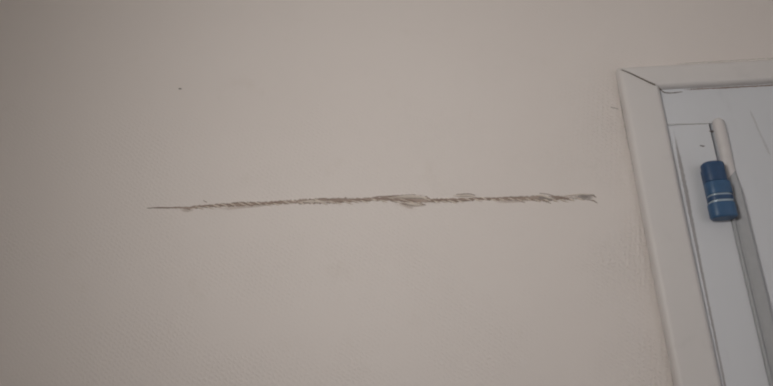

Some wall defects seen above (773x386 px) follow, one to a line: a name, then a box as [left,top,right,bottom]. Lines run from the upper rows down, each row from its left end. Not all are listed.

crack [150,193,597,210]